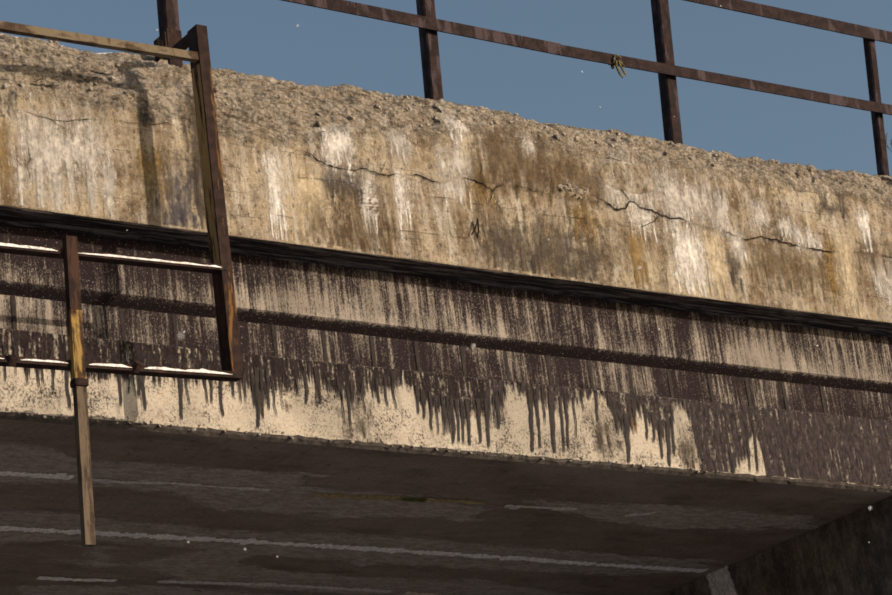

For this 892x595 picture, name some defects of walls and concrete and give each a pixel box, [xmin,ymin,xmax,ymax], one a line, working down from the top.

water stain [261,126,379,253]
water stain [385,117,411,162]
water stain [391,171,414,240]
water stain [436,111,472,208]
water stain [520,136,535,153]
crack [290,149,831,252]
water stain [482,213,610,284]
water stain [0,328,71,409]
water stain [84,337,892,486]
water stain [0,441,78,485]
water stain [91,460,488,522]
water stain [504,500,819,531]